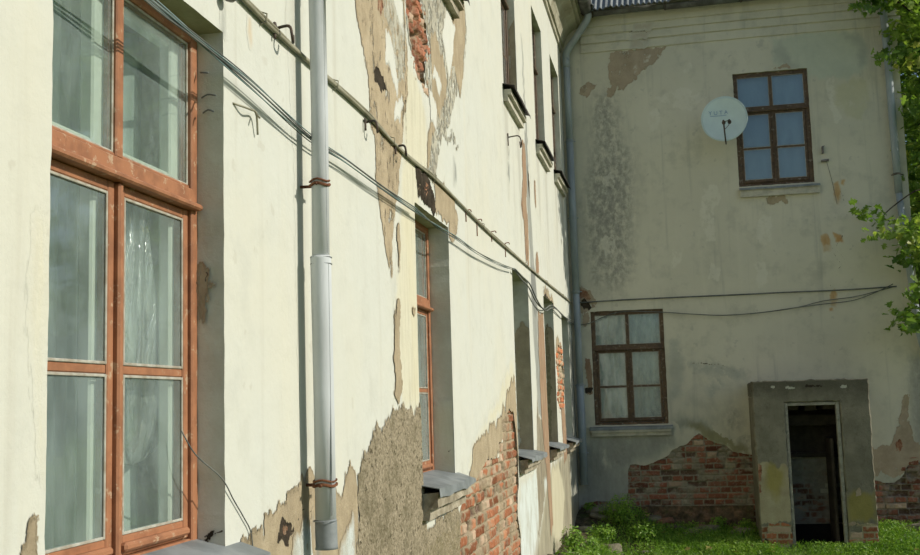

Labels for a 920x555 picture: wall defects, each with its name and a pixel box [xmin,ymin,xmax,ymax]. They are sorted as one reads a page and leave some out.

peeling [579,46,666,98]
peeling [355,0,467,279]
peeling [521,140,539,274]
spalling [196,261,215,324]
damp [502,36,685,555]
peeling [21,513,39,555]
peeling [241,460,358,555]
flaking render [460,311,568,555]
flaking render [581,394,920,548]